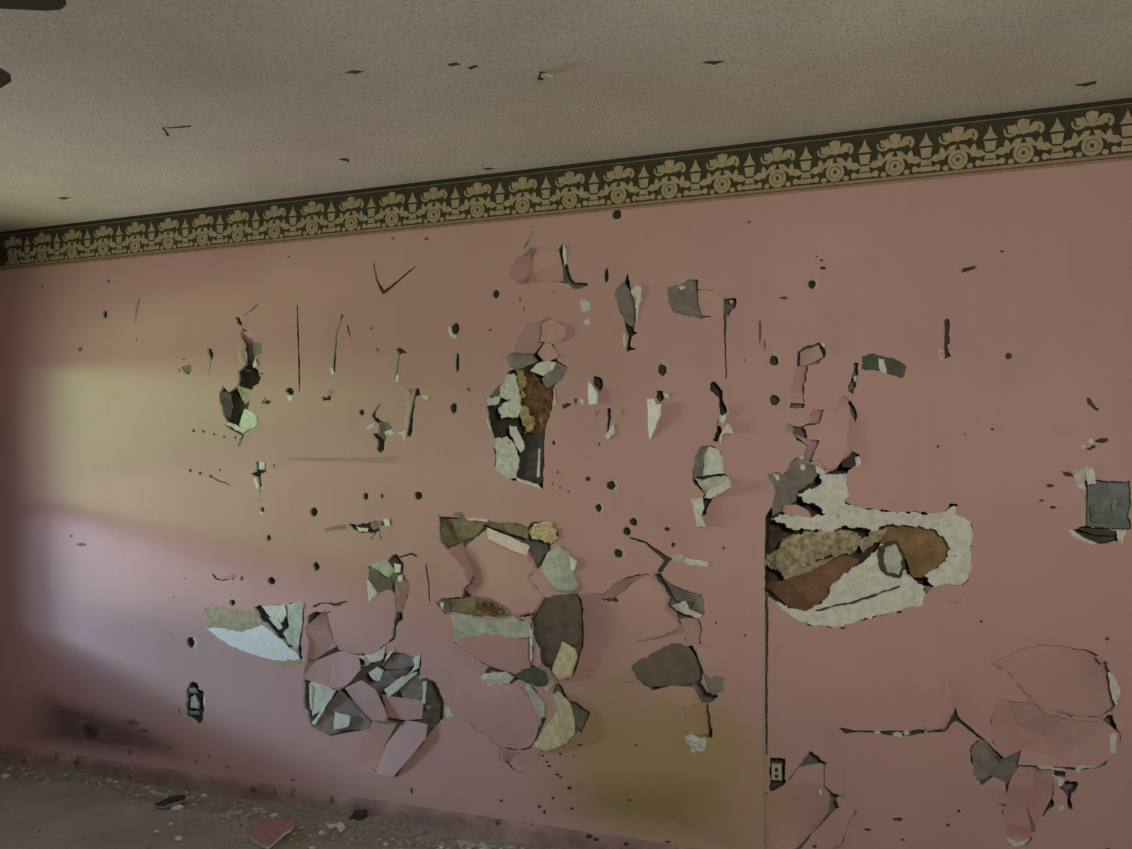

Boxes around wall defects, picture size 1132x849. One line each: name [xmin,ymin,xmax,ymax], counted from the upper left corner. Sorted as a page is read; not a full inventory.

spalling [219,317,262,434]
crack [373,263,416,294]
spalling [486,318,568,490]
spalling [604,267,642,352]
spalling [691,381,733,527]
spalling [764,342,973,630]
spalling [1068,525,1127,545]
spalling [186,563,454,779]
spalling [435,512,559,718]
spalling [593,573,728,753]
crack [837,674,1004,761]
spalling [765,751,857,849]